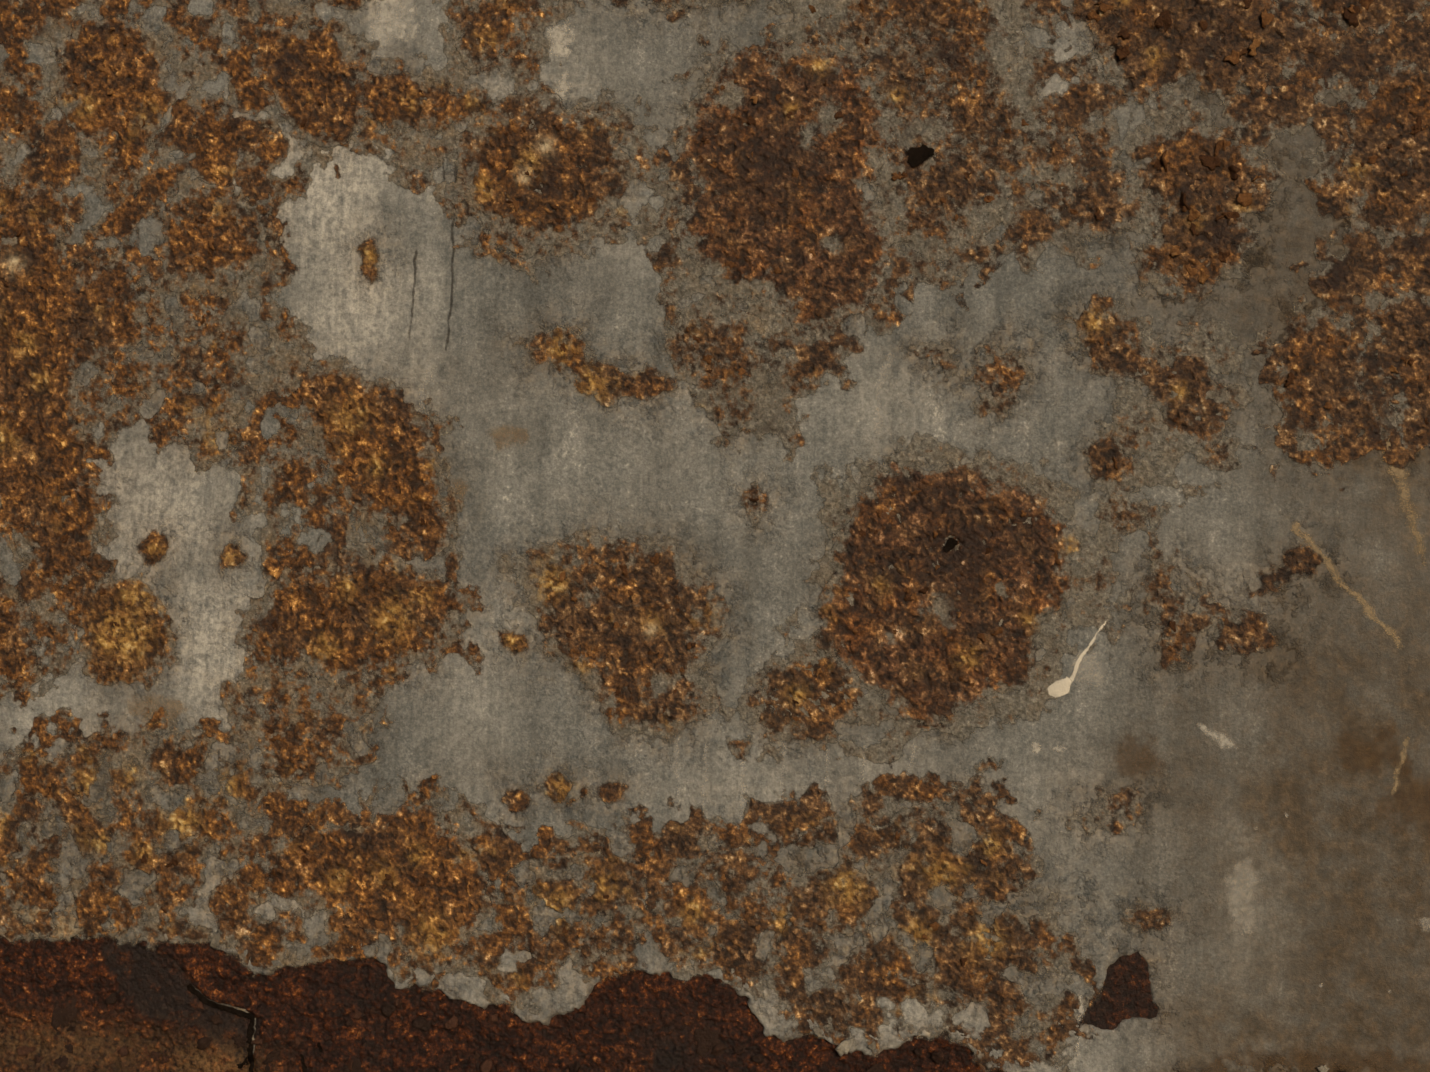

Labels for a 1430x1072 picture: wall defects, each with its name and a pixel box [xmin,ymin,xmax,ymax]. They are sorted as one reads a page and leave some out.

corrosion [514,0,1430,453]
corrosion [0,0,1082,1033]
corrosion [1080,438,1133,480]
peeling [0,932,1002,1072]
peeling [1079,952,1158,1030]